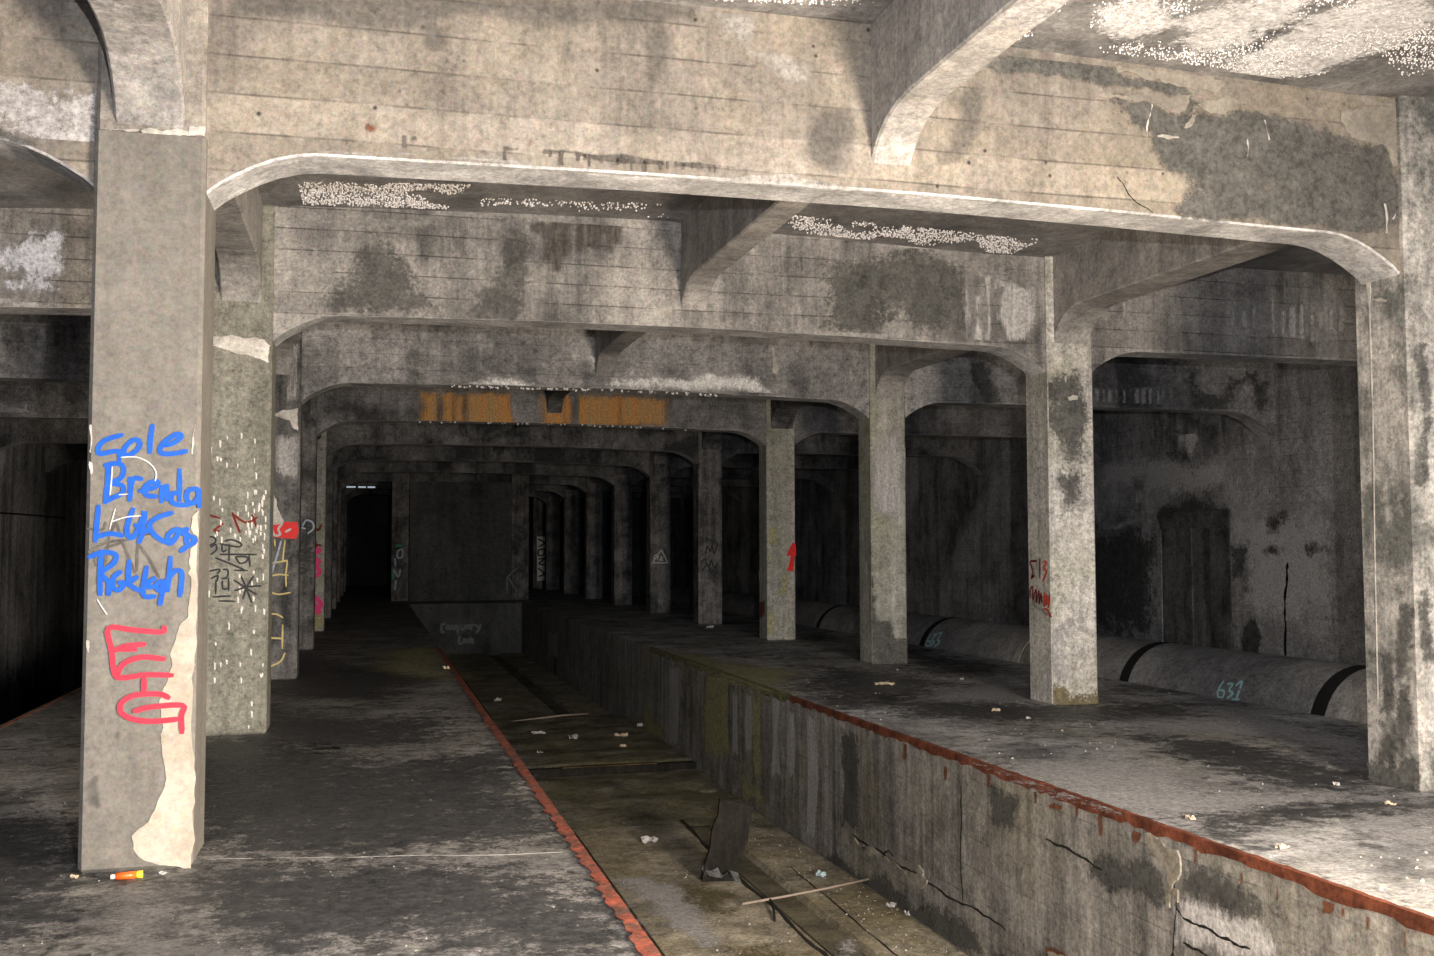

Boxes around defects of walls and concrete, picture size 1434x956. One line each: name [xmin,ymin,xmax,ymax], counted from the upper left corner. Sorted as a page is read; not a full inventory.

leakage [1089,0,1434,79]
leakage [0,81,95,146]
leakage [988,56,1399,233]
leakage [322,241,437,315]
leakage [467,222,621,320]
peeling [132,511,199,868]
crack [1171,884,1251,956]
rust [1323,901,1344,917]